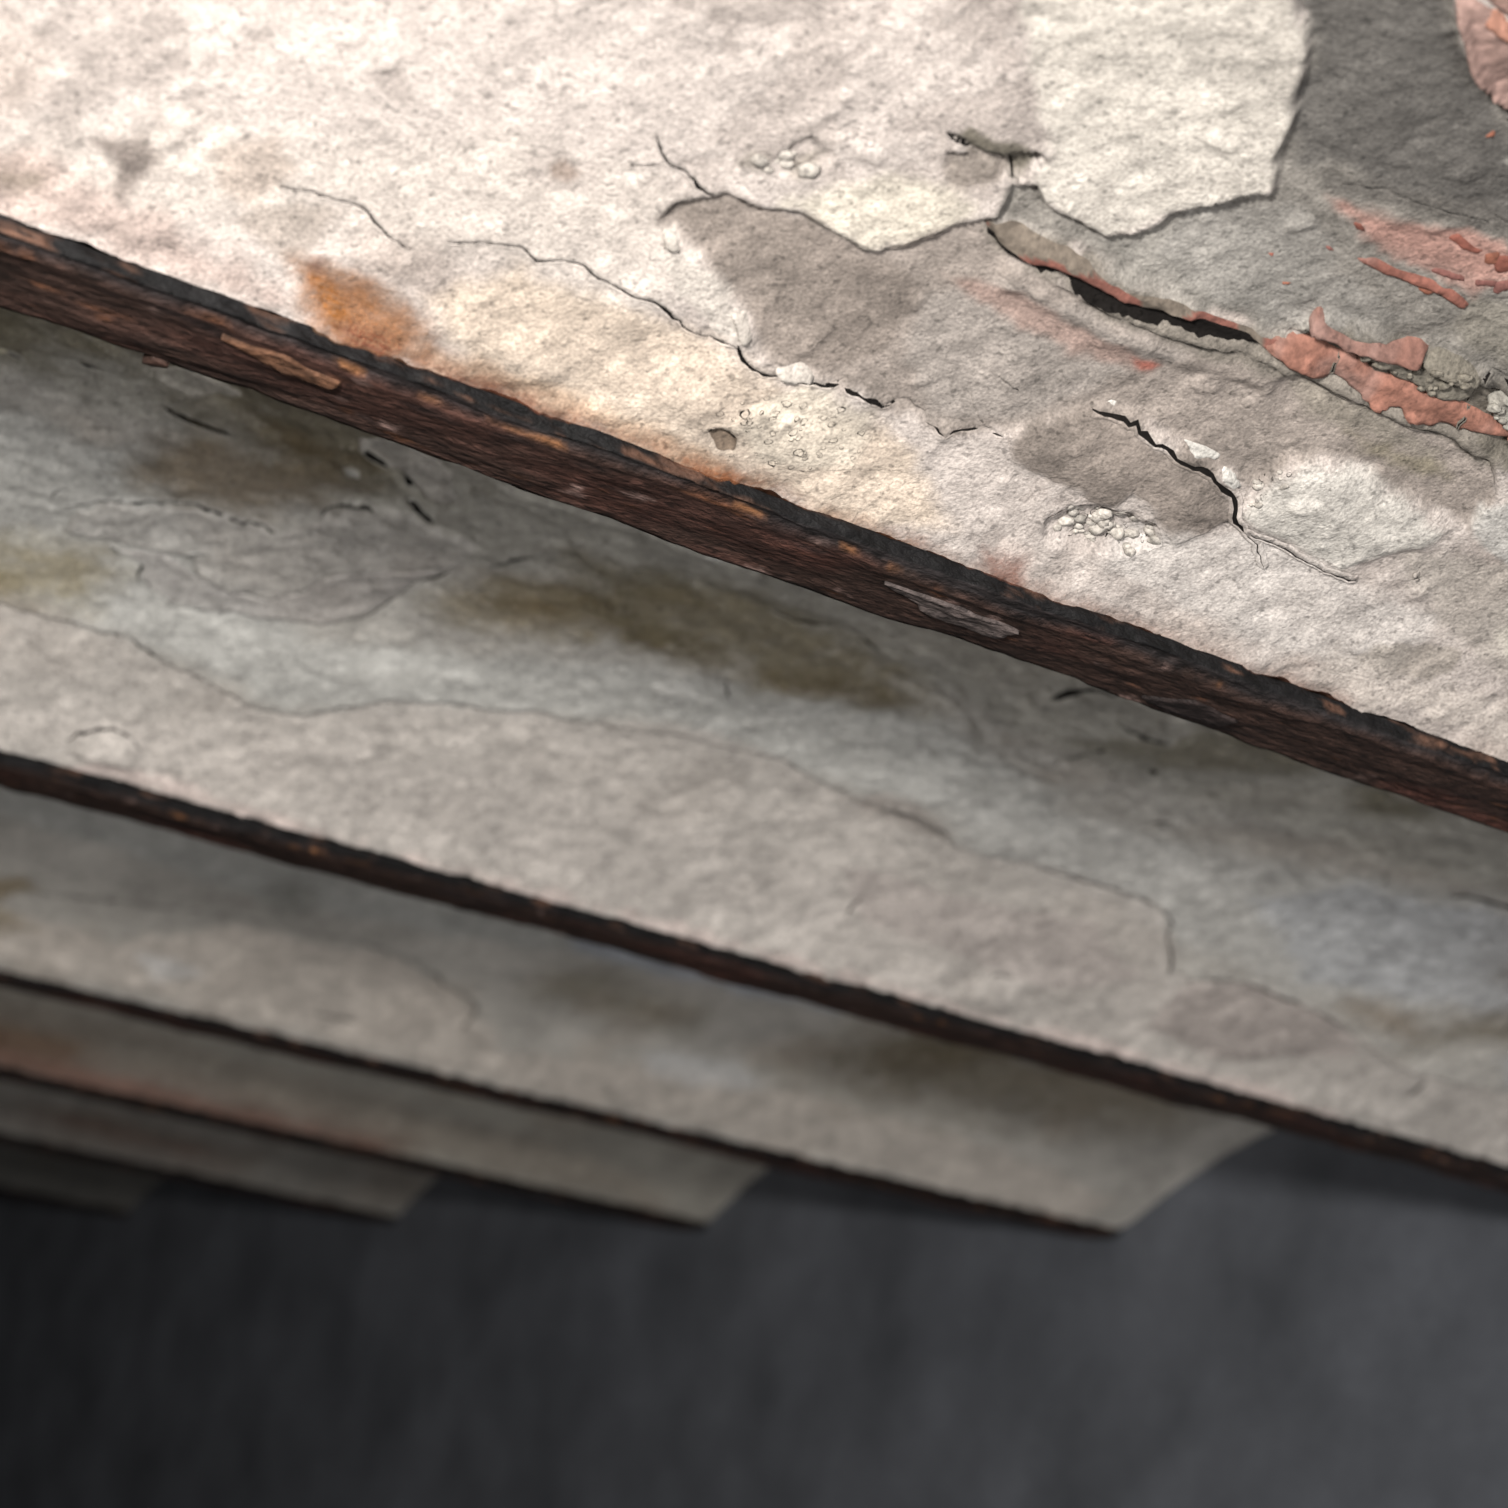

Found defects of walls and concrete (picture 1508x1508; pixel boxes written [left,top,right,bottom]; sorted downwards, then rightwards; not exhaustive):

crack [629,133,869,251]
flaking render [661,0,1508,525]
rust [311,275,409,354]
crack [278,182,1004,439]
crack [79,360,99,370]
crack [990,370,1019,392]
crack [163,405,232,438]
crack [1091,400,1358,583]
flaking render [1044,505,1163,559]
crack [348,555,539,623]
crack [770,606,880,653]